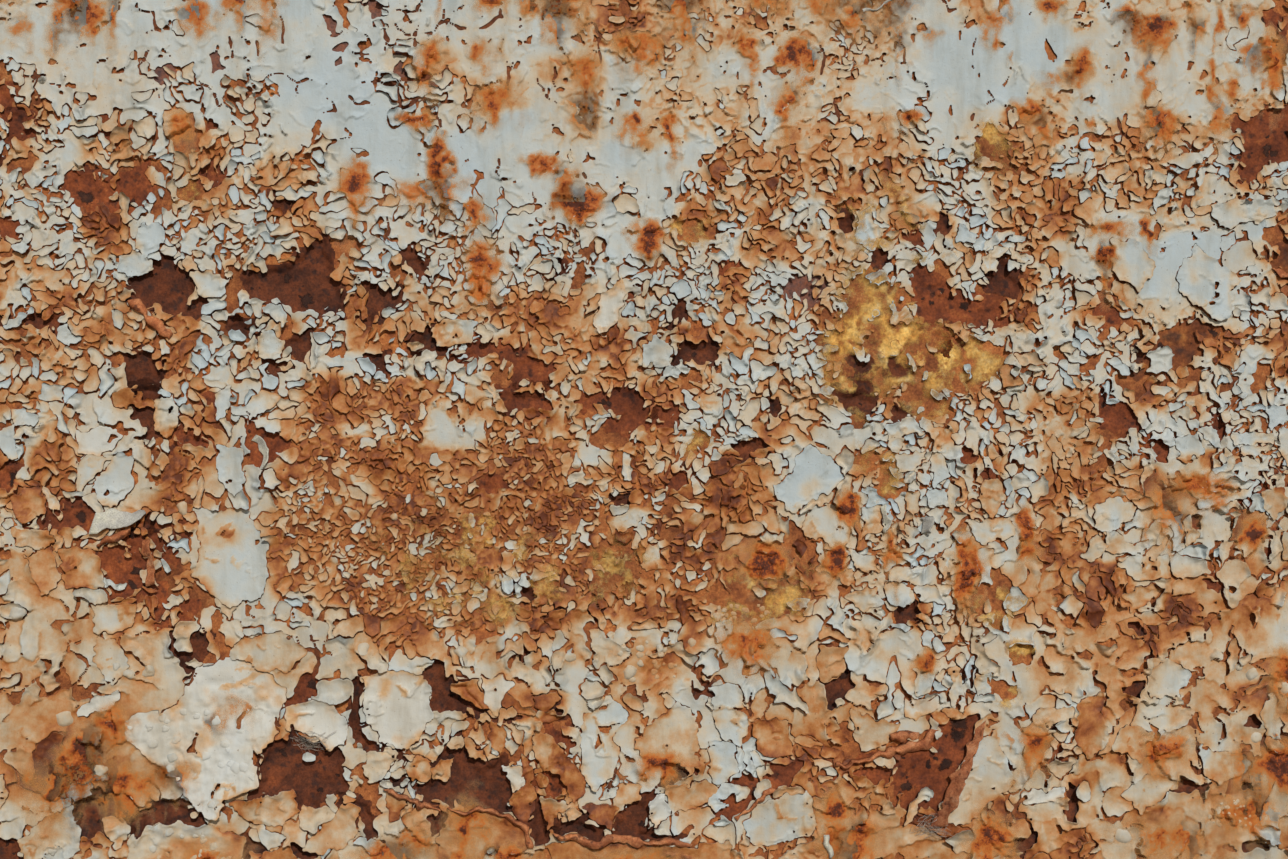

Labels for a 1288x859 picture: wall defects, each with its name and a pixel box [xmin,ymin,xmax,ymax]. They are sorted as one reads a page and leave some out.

peeling [334,0,475,145]
rust [1116,1,1288,191]
peeling [1238,53,1288,121]
rust [867,207,1023,332]
peeling [1110,237,1156,292]
rust [359,293,720,443]
rust [827,352,913,424]
peeling [685,446,711,483]
peeling [157,527,174,542]
rust [240,656,700,859]
peeling [865,753,901,774]
rust [817,712,989,859]